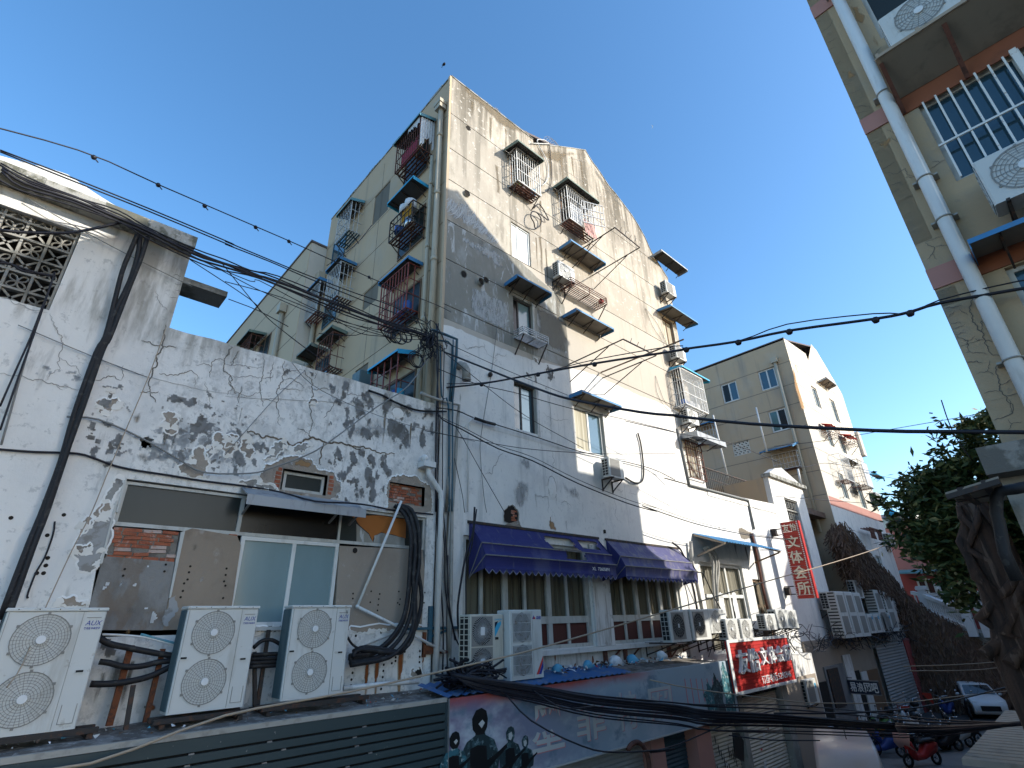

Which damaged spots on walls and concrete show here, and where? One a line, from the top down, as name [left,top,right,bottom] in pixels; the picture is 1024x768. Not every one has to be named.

leakage [446,198,500,266]
leakage [465,87,521,144]
leakage [536,201,567,351]
leakage [540,151,584,184]
crack [0,274,430,465]
crack [949,299,1021,429]
peeling [68,372,434,574]